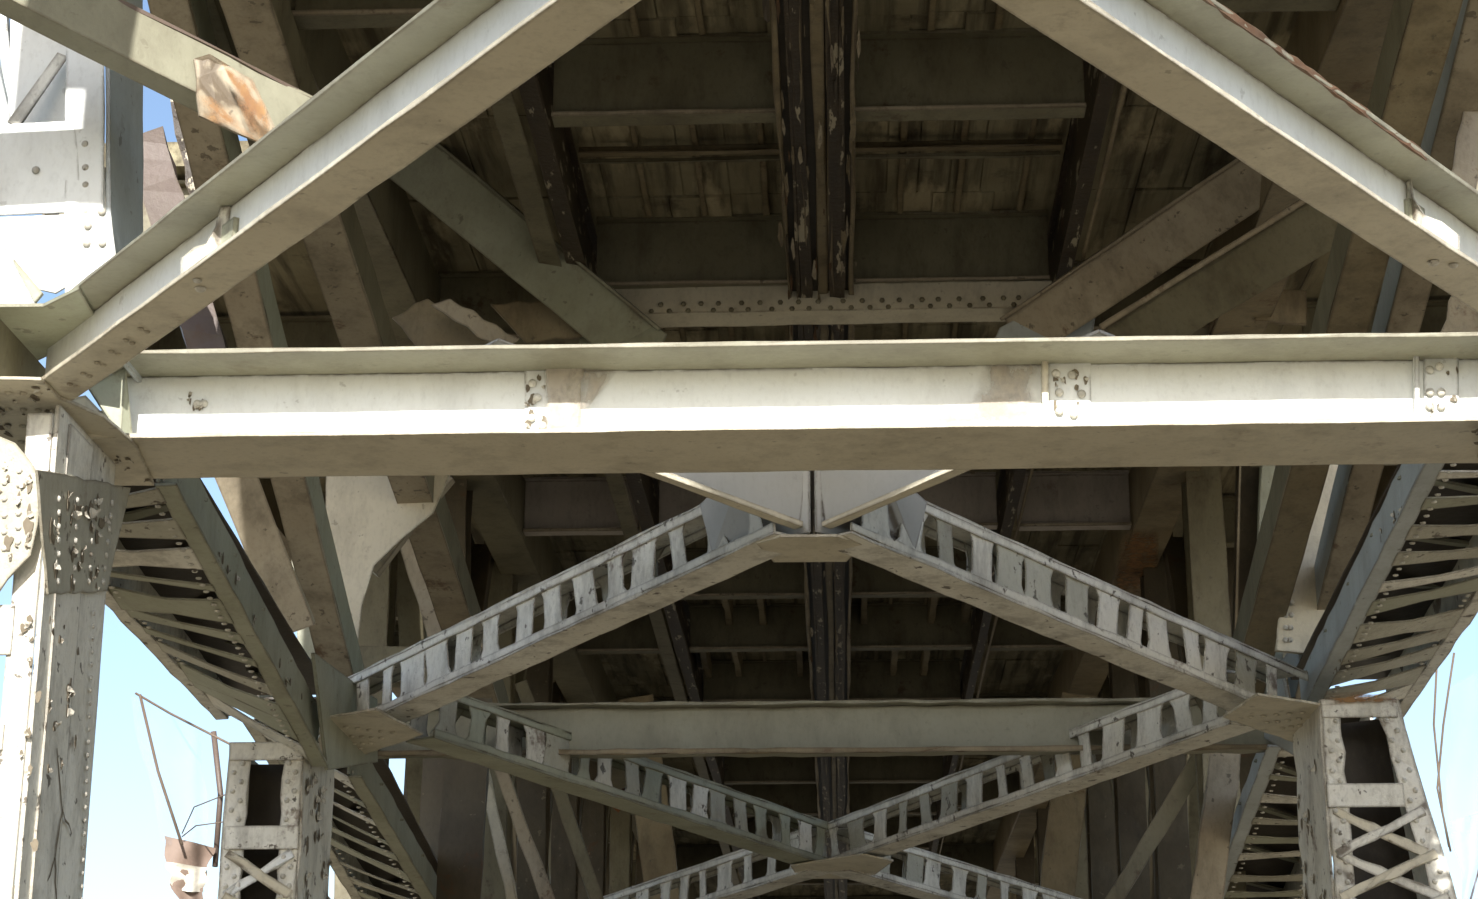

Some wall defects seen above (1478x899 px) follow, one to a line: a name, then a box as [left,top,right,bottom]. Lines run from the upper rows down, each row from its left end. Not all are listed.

corrosion [205,69,269,134]
peeling [762,0,860,300]
peeling [812,324,855,341]
peeling [0,462,111,592]
peeling [804,556,853,701]